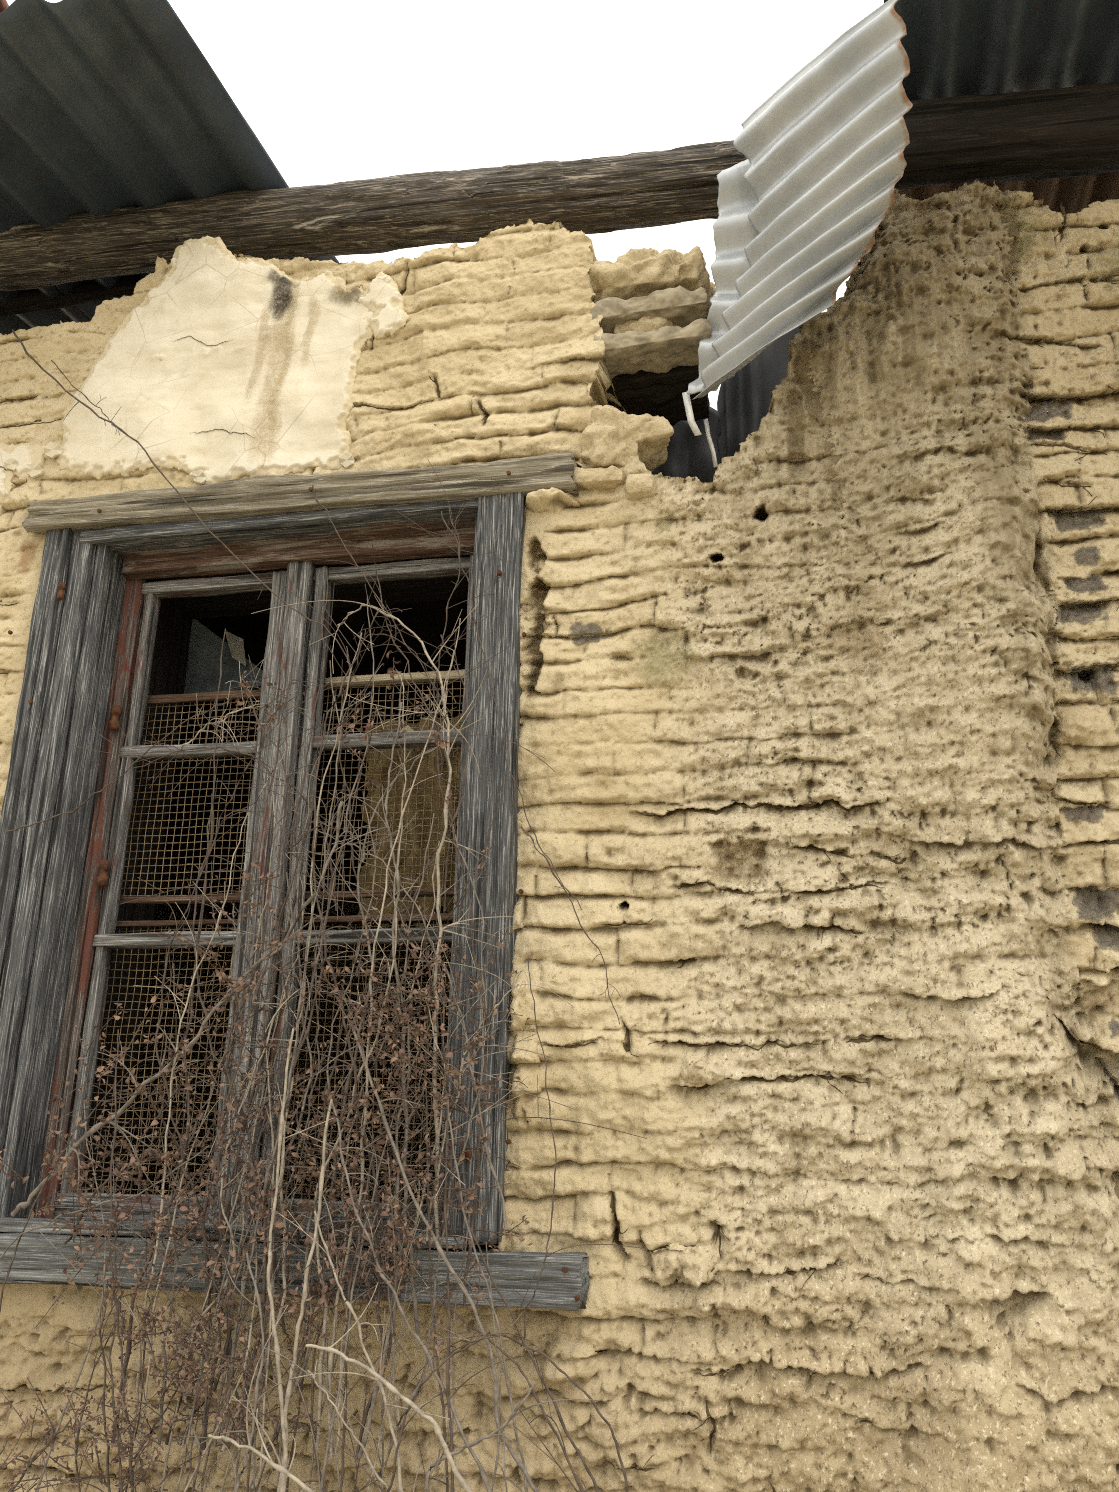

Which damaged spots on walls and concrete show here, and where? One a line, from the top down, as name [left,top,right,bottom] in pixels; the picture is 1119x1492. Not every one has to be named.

water stain [269,271,292,316]
water stain [332,287,360,303]
peeling [0,235,410,515]
crack [192,429,255,438]
crack [1099,1060,1119,1097]
crack [610,1192,728,1285]